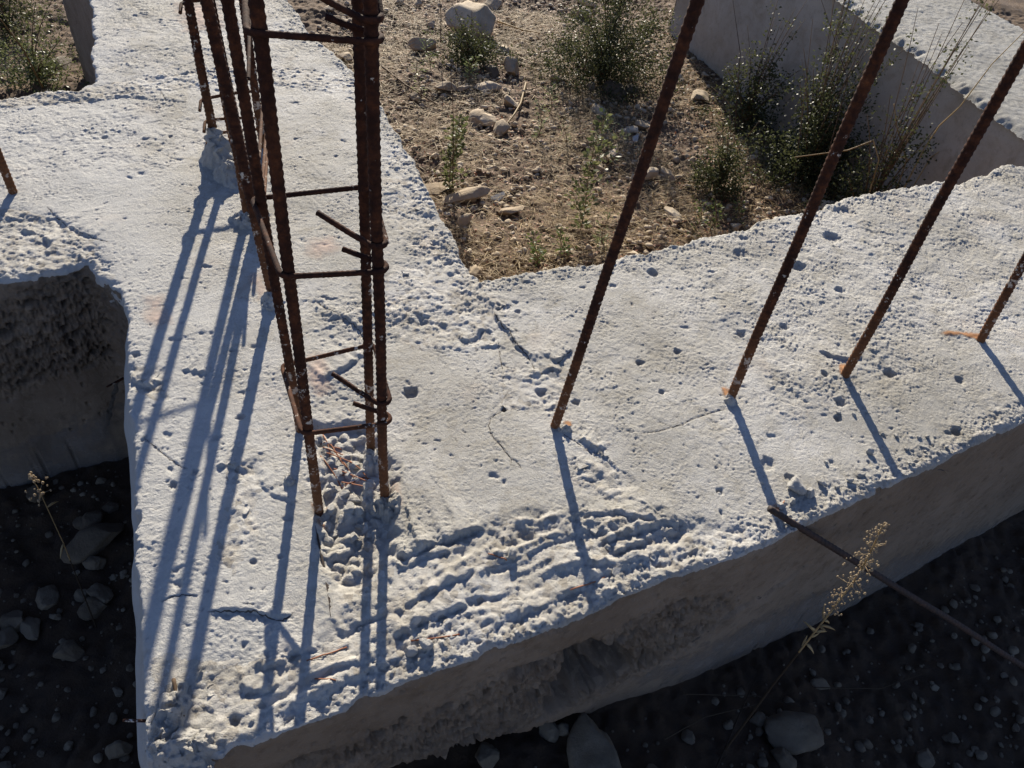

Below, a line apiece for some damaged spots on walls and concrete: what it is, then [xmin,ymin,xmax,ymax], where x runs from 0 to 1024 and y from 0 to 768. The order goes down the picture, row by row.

crack [488,305,571,467]
crack [168,594,294,621]